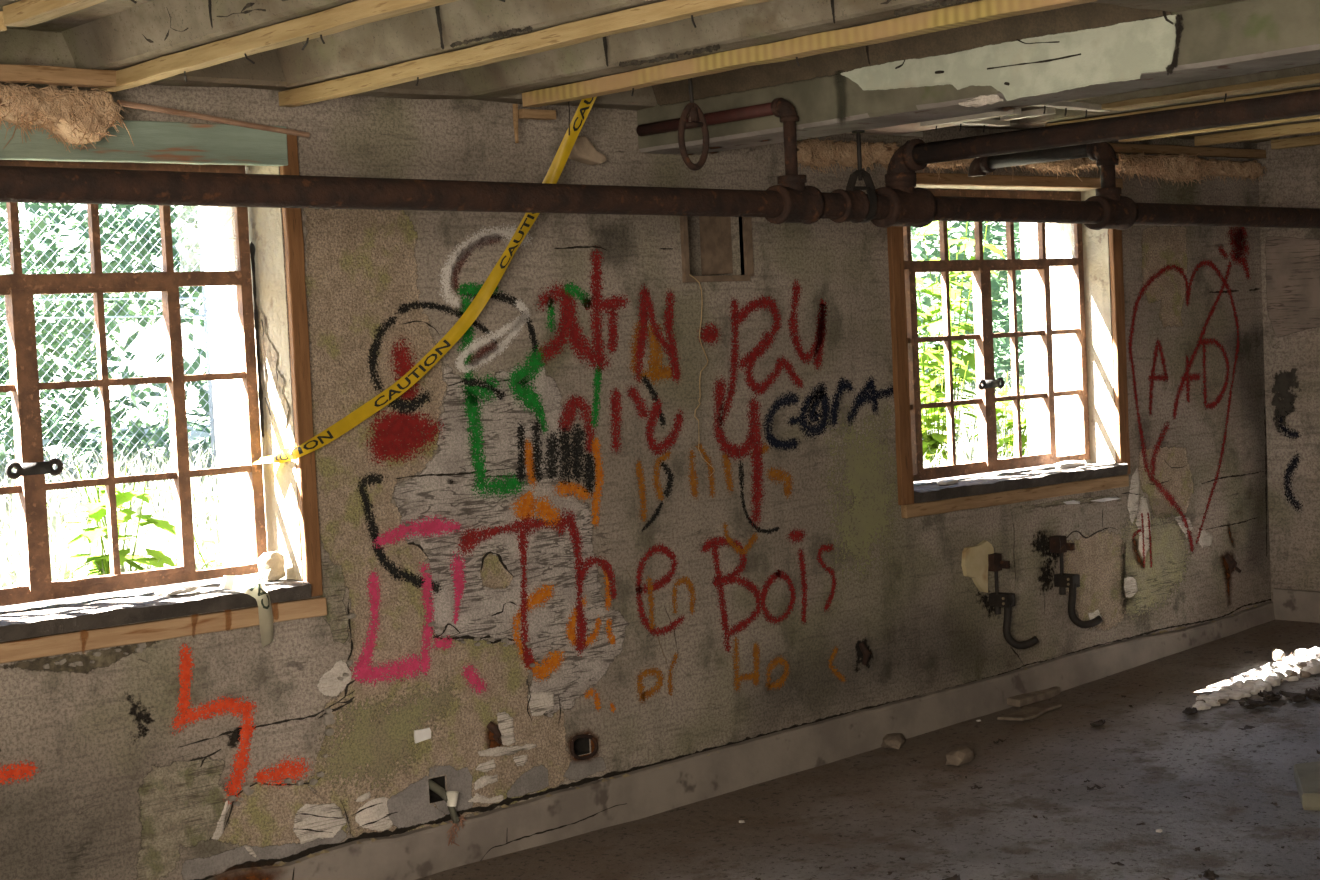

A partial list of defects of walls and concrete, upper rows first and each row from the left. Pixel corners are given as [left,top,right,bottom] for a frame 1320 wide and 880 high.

peeling [841,11,1177,108]
spalling [136,208,606,880]